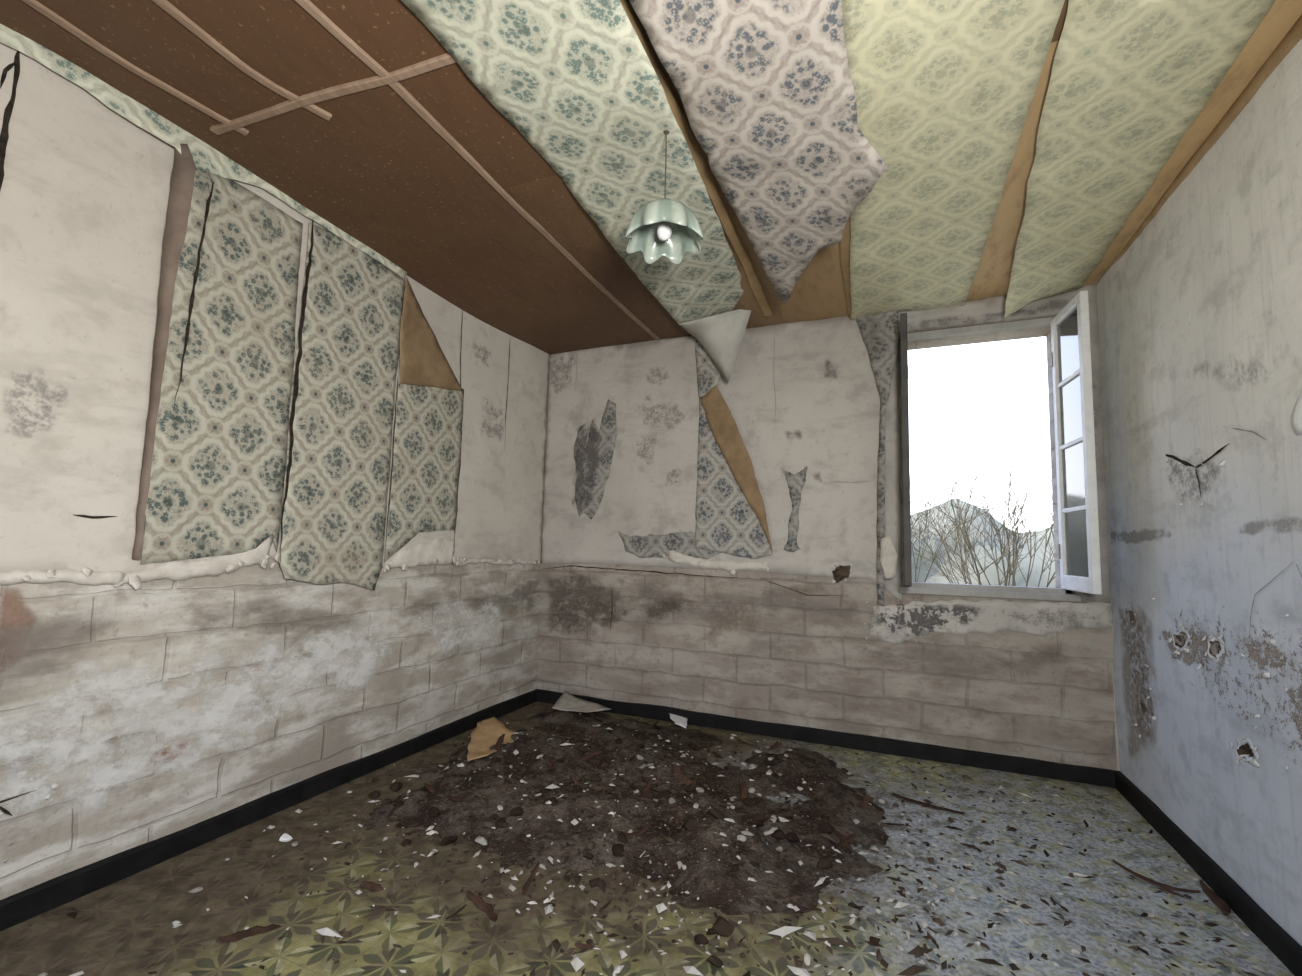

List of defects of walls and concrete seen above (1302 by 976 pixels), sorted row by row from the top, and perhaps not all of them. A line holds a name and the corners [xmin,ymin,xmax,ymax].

crack [0,50,20,190]
peeling [400,276,463,391]
flaking render [382,539,460,573]
water stain [423,583,532,652]
water stain [550,576,617,630]
water stain [0,627,391,809]
crack [0,790,36,816]